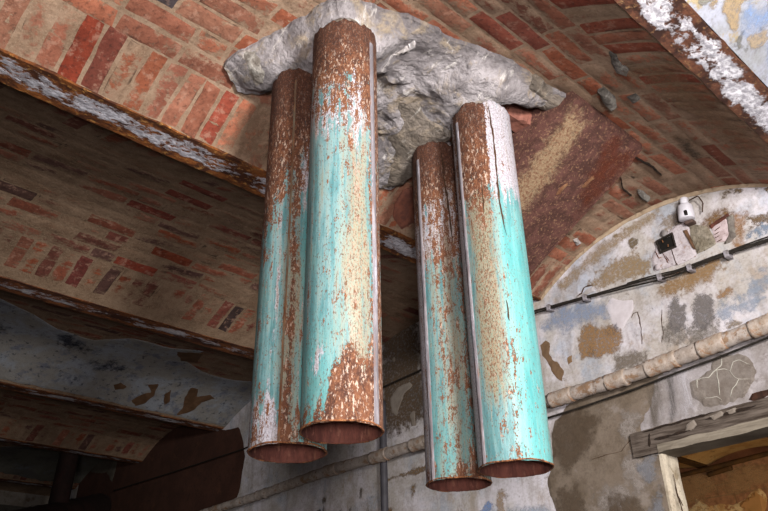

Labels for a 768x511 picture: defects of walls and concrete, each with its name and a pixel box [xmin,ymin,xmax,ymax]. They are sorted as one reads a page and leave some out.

peeling [699,0,768,49]
peeling [131,384,171,406]
peeling [177,388,215,415]
peeling [540,341,572,381]
peeling [547,334,768,511]
crack [690,353,756,407]